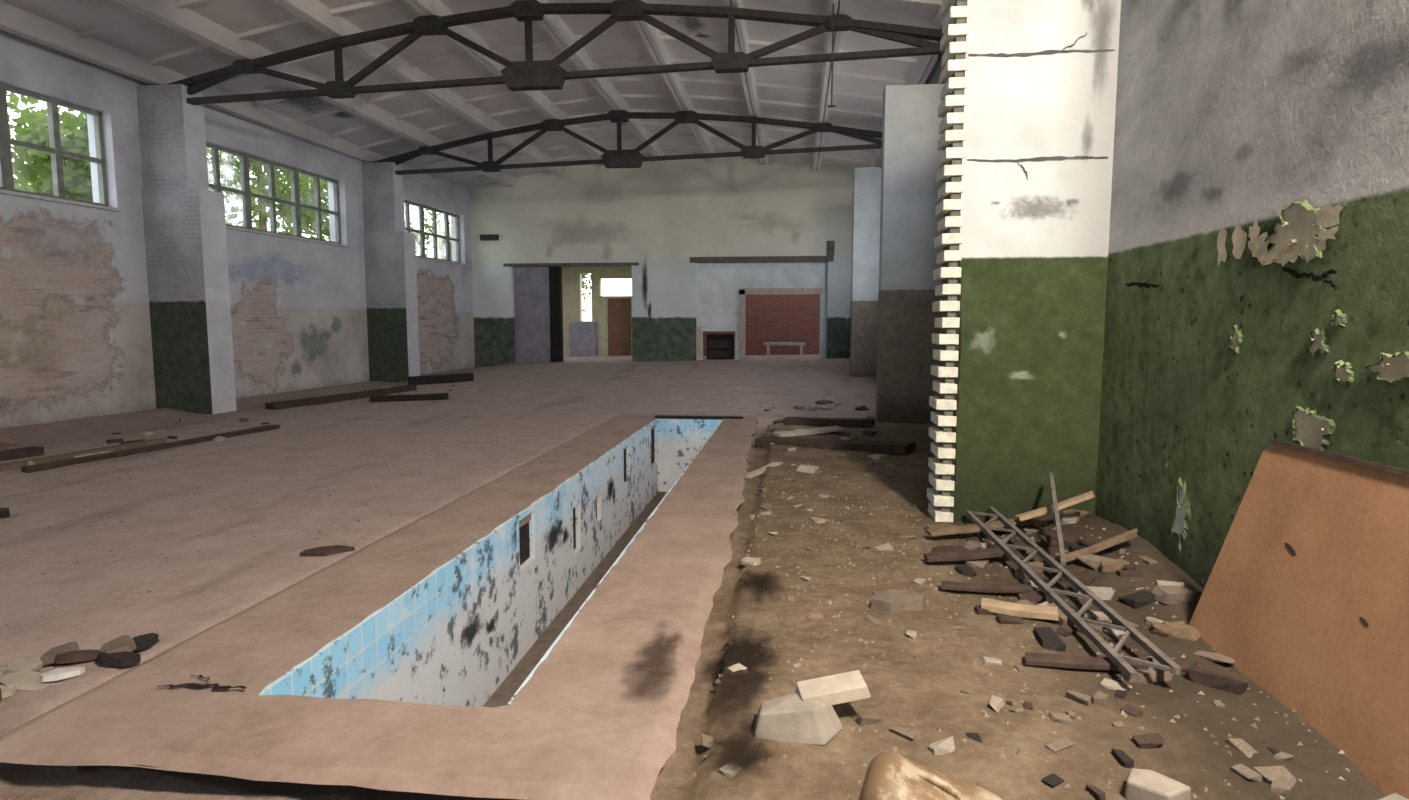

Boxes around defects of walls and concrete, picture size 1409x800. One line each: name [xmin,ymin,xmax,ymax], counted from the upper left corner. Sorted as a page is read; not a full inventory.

crack [968,32,1115,57]
crack [967,156,1108,179]
flaking render [1217,199,1343,268]
crack [1282,267,1338,290]
peeling [0,208,125,420]
peeling [231,275,297,392]
peeling [417,269,460,373]
peeling [1309,309,1409,388]
flaking render [1292,406,1336,451]